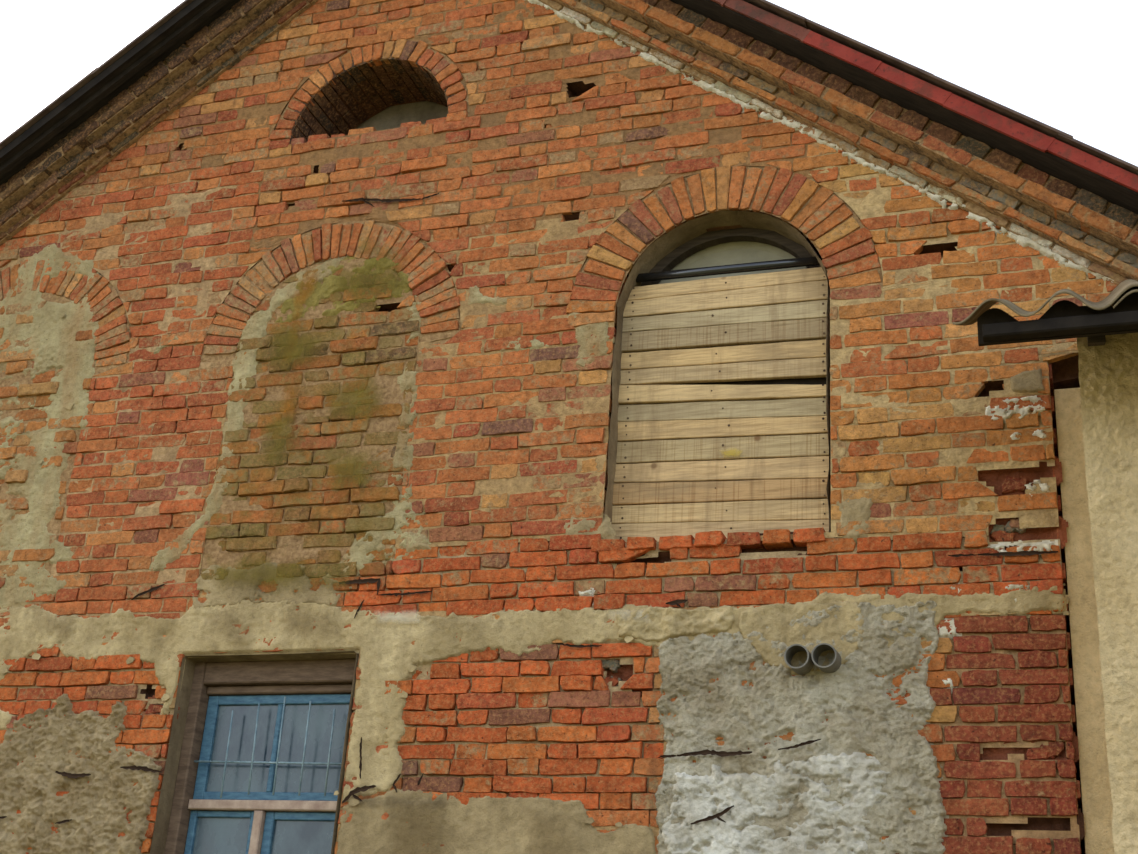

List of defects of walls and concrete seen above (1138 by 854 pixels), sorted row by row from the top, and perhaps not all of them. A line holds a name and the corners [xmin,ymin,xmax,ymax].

spalling [978,380,1004,397]
spalling [978,456,1063,496]
flaking render [0,244,671,854]
spalling [987,516,1068,550]
flaking render [793,584,1070,648]